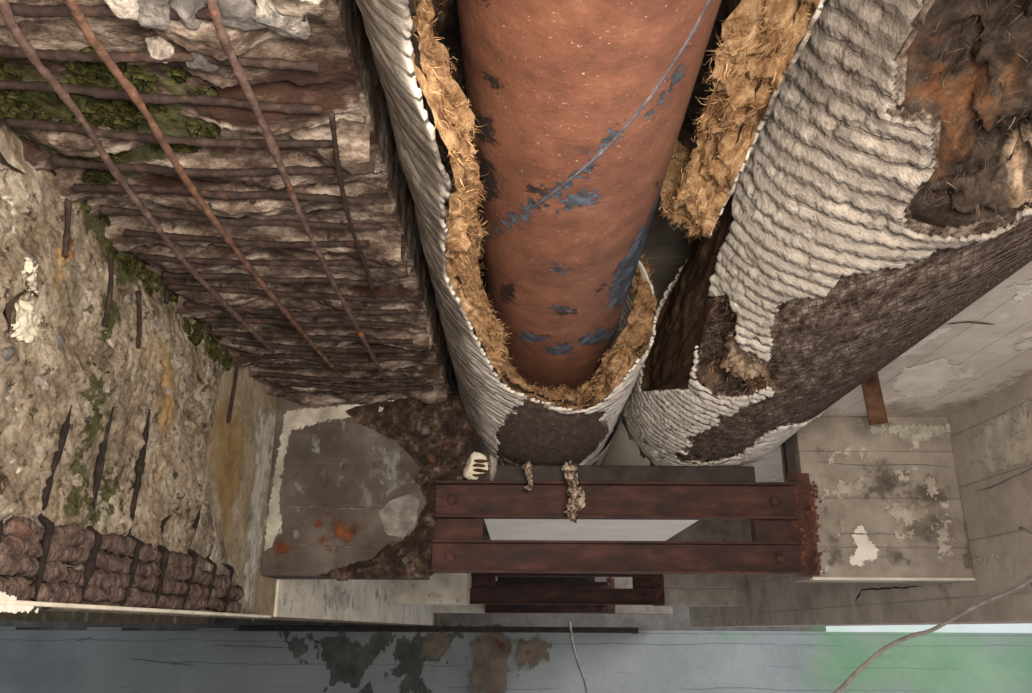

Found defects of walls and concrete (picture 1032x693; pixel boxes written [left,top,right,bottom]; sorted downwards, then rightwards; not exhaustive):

spalling [0,0,552,693]
peeling [796,476,870,577]
peeling [838,520,879,567]
peeling [881,466,957,561]